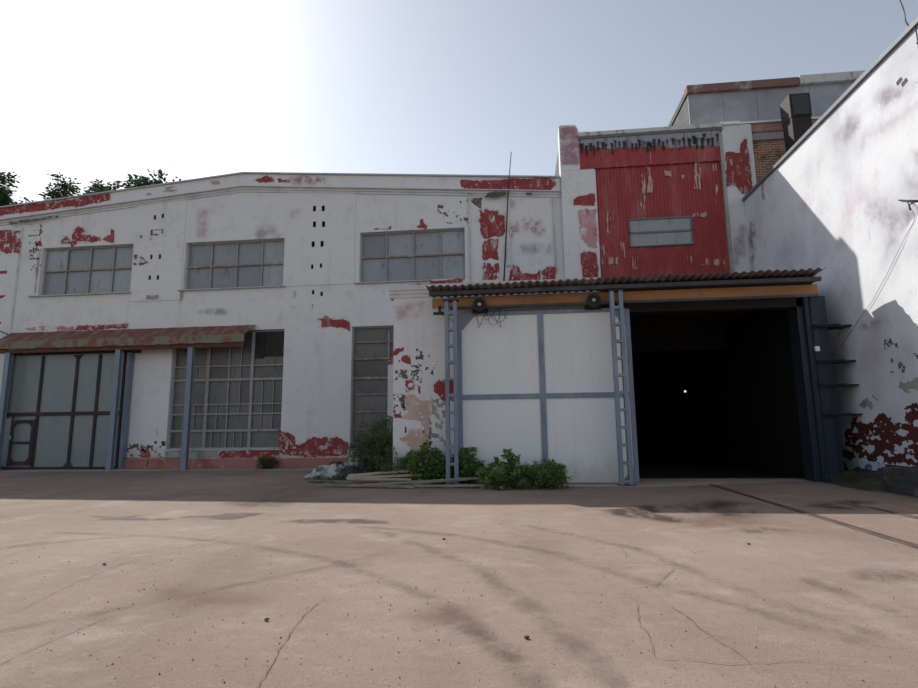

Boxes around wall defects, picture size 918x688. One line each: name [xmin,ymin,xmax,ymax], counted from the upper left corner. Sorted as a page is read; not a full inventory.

peeling [725,139,753,194]
peeling [0,193,114,270]
peeling [437,178,557,281]
peeling [573,193,599,278]
peeling [318,316,350,331]
peeling [127,429,349,459]
spalling [388,347,454,468]
peeling [842,338,918,471]